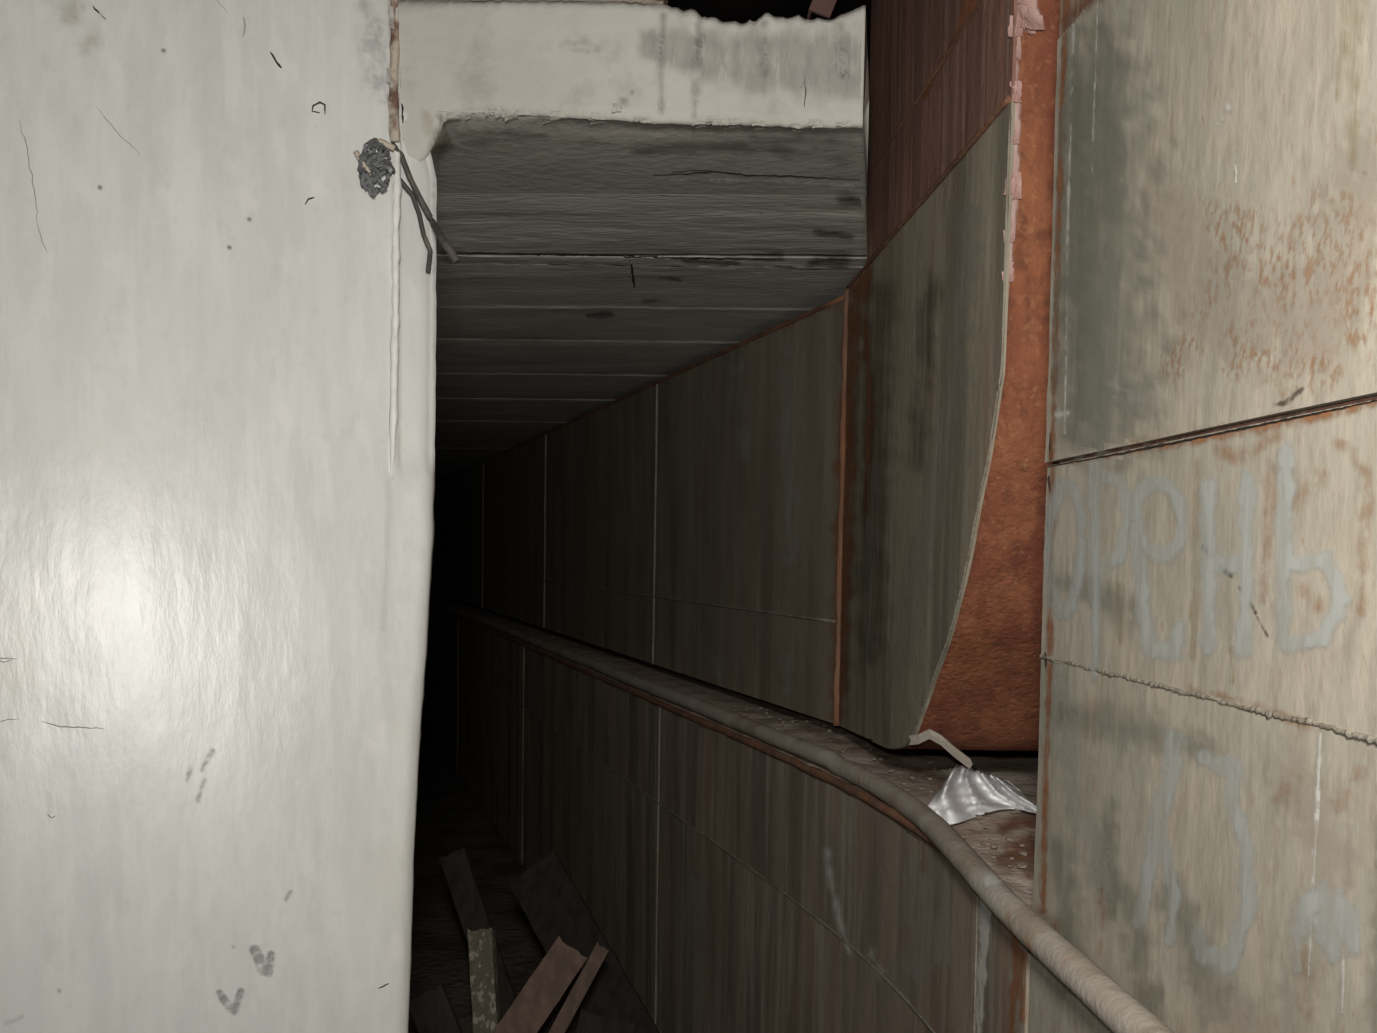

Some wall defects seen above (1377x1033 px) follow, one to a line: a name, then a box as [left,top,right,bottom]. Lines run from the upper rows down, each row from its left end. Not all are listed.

corrosion [1000,0,1094,913]